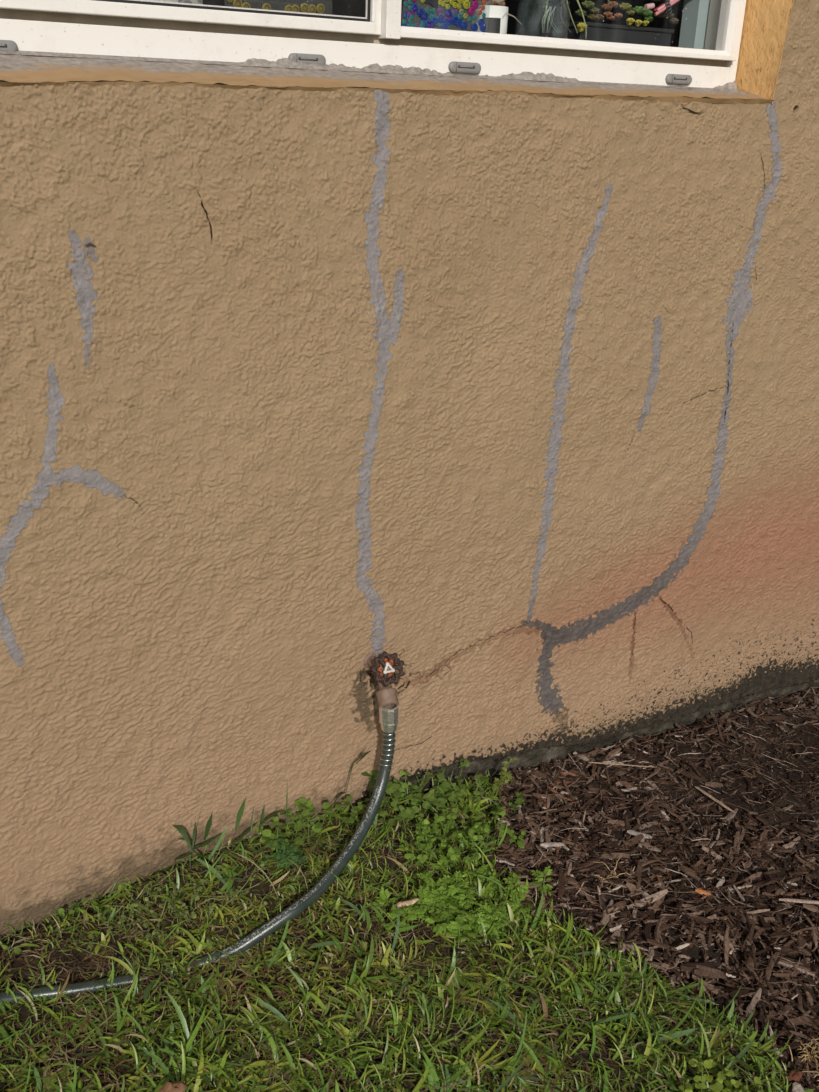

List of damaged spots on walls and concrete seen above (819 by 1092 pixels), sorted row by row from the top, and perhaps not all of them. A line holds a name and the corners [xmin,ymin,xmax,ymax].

crack [0,363,141,667]
crack [68,230,98,356]
crack [354,90,406,655]
crack [421,93,783,717]
damp [350,668,377,722]
damp [389,619,819,782]